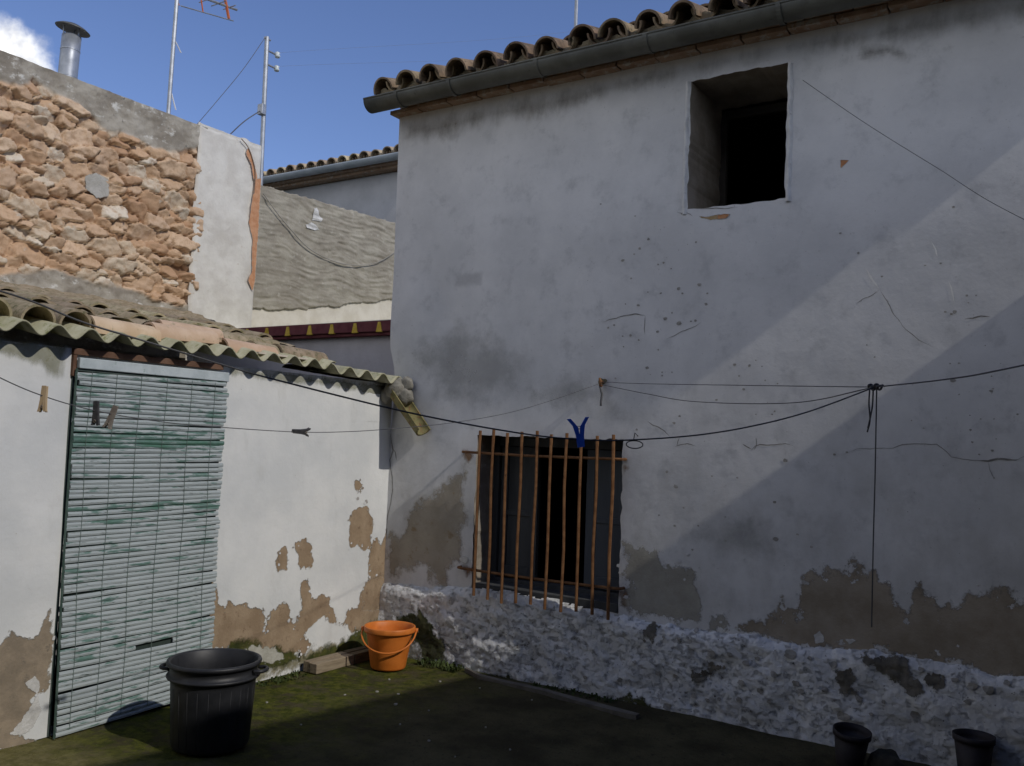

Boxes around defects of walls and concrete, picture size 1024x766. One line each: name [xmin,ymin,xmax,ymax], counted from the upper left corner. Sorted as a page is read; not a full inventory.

crack [843,443,1024,476]
peeling [0,608,56,749]
peeling [208,479,386,664]
flaking render [617,541,1024,718]